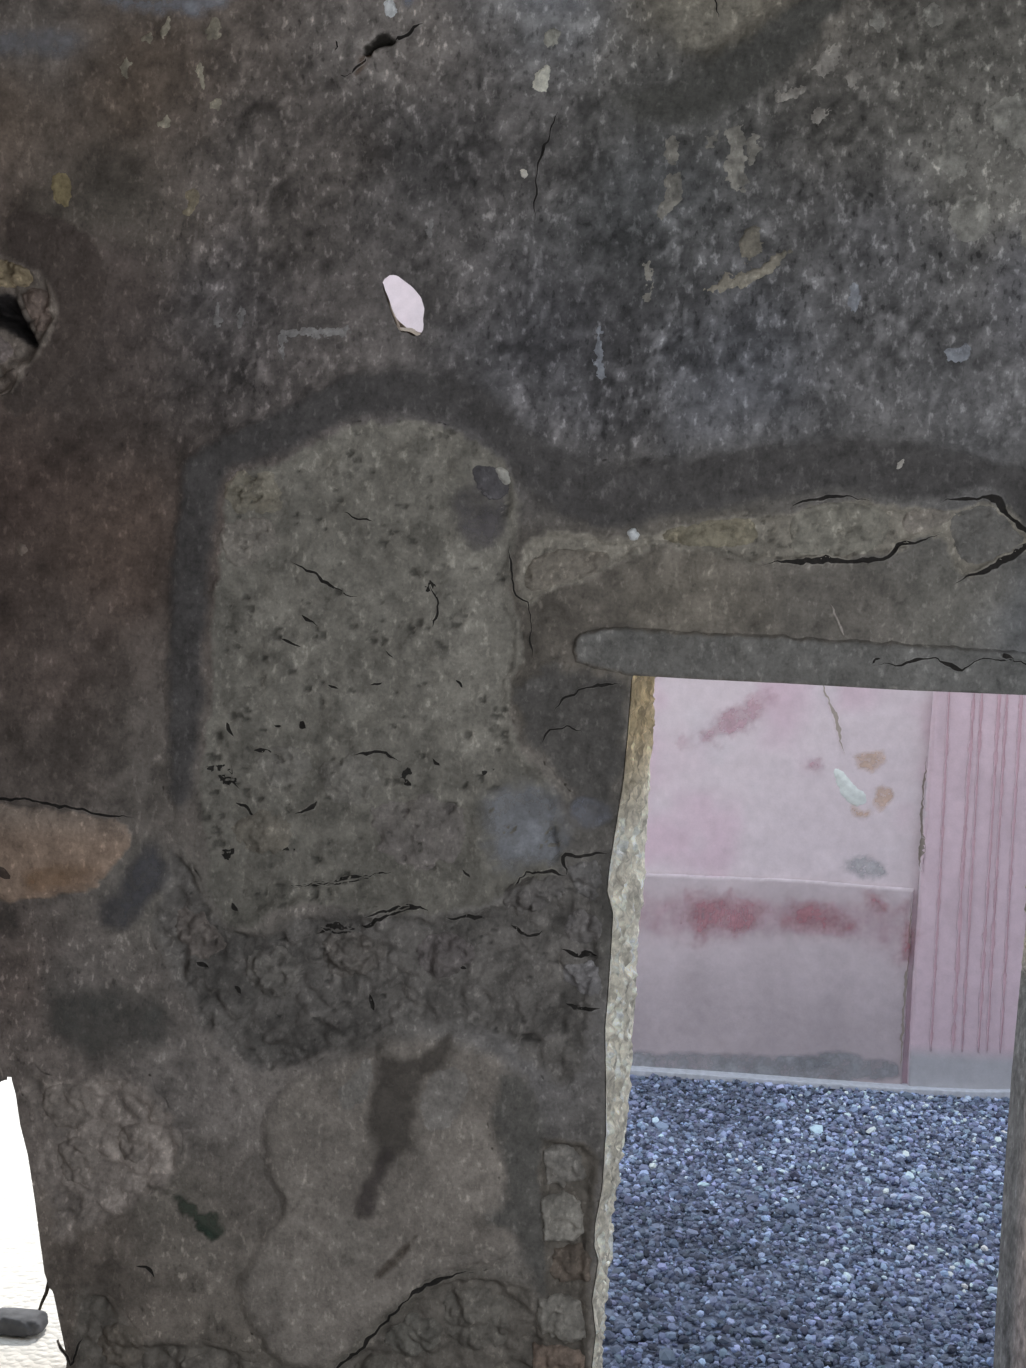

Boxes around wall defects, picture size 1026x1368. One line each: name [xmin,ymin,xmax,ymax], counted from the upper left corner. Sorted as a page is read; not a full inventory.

crack [334,40,367,78]
crack [395,22,423,42]
peeling [646,0,778,64]
spalling [0,251,62,403]
crack [761,492,1026,585]
crack [870,651,1026,673]
crack [0,795,134,819]
crack [334,1270,474,1368]